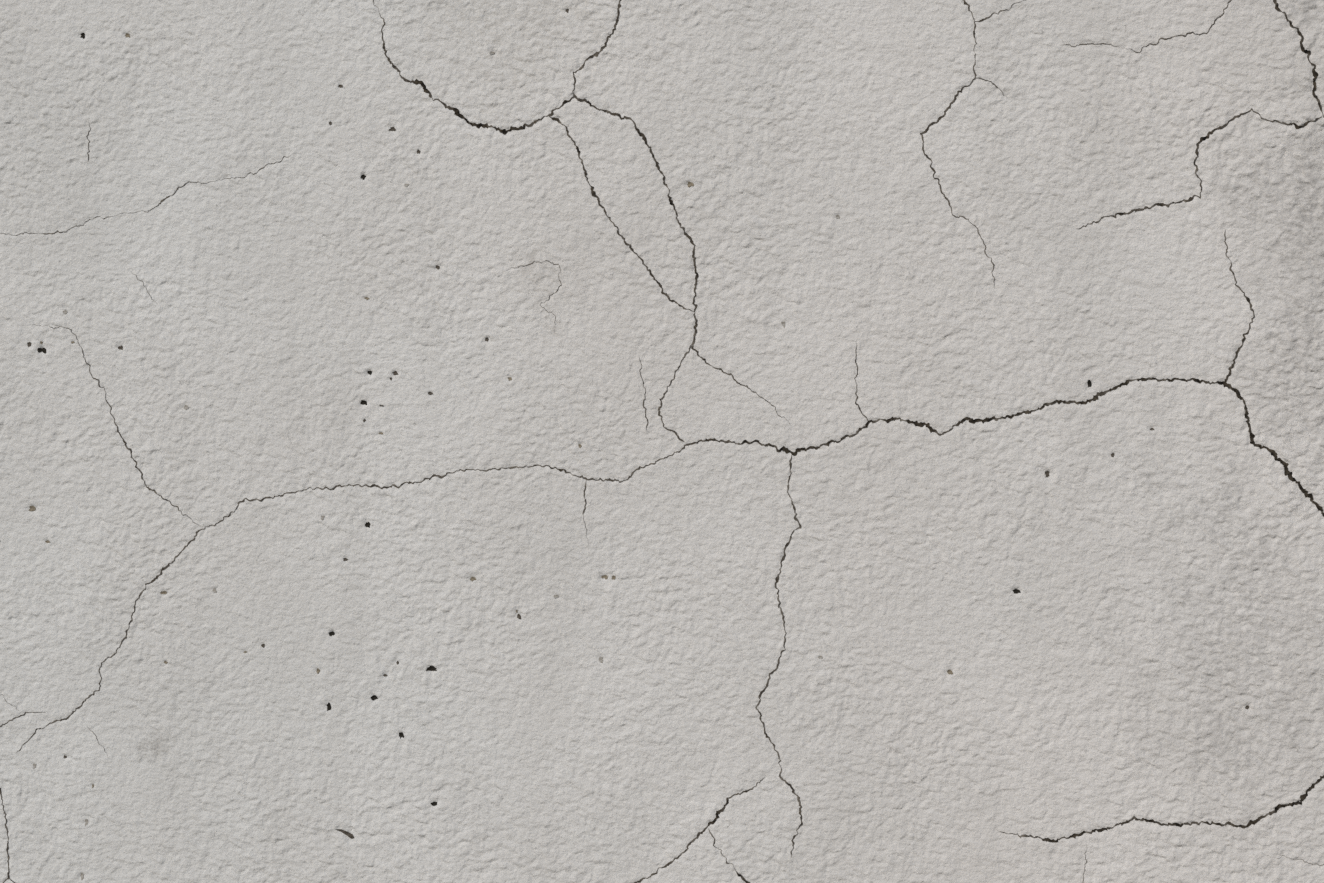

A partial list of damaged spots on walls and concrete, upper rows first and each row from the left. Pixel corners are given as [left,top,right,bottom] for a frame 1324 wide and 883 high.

crack [0,156,286,236]
crack [373,0,781,417]
crack [920,0,1023,282]
crack [1063,0,1324,229]
crack [16,233,1324,856]
crack [0,788,15,883]
crack [634,778,764,883]
crack [1000,775,1324,881]